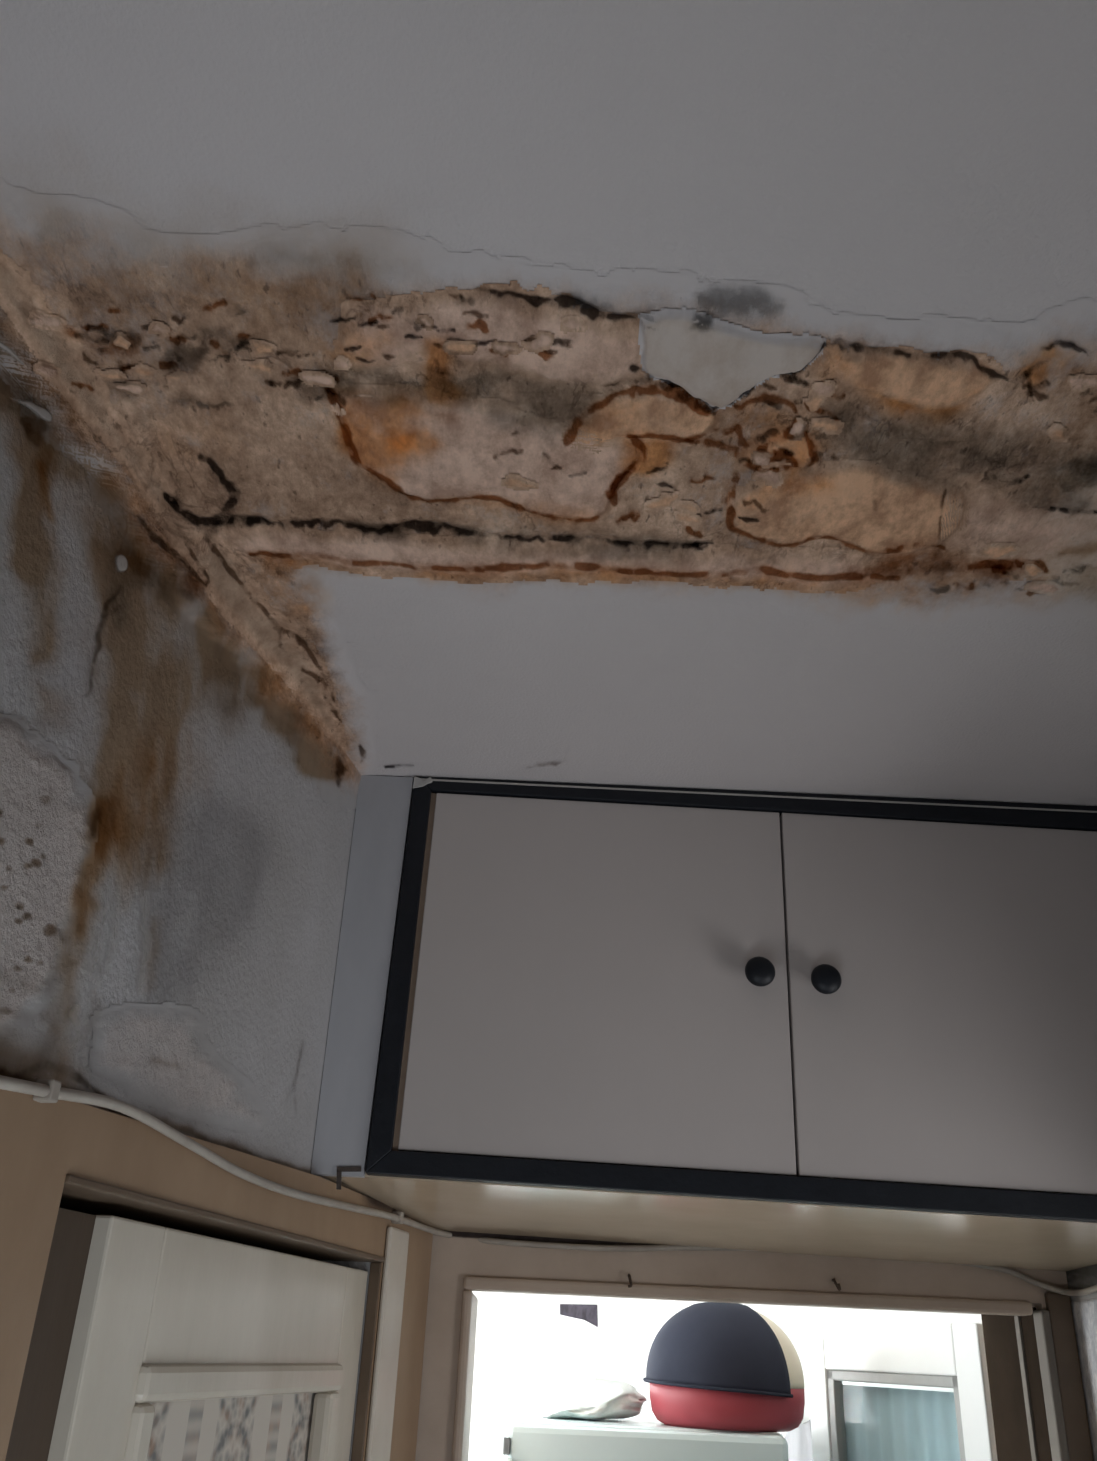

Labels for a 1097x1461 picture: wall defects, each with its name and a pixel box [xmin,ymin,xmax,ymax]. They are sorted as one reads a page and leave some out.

flaking render [0,178,1097,812]